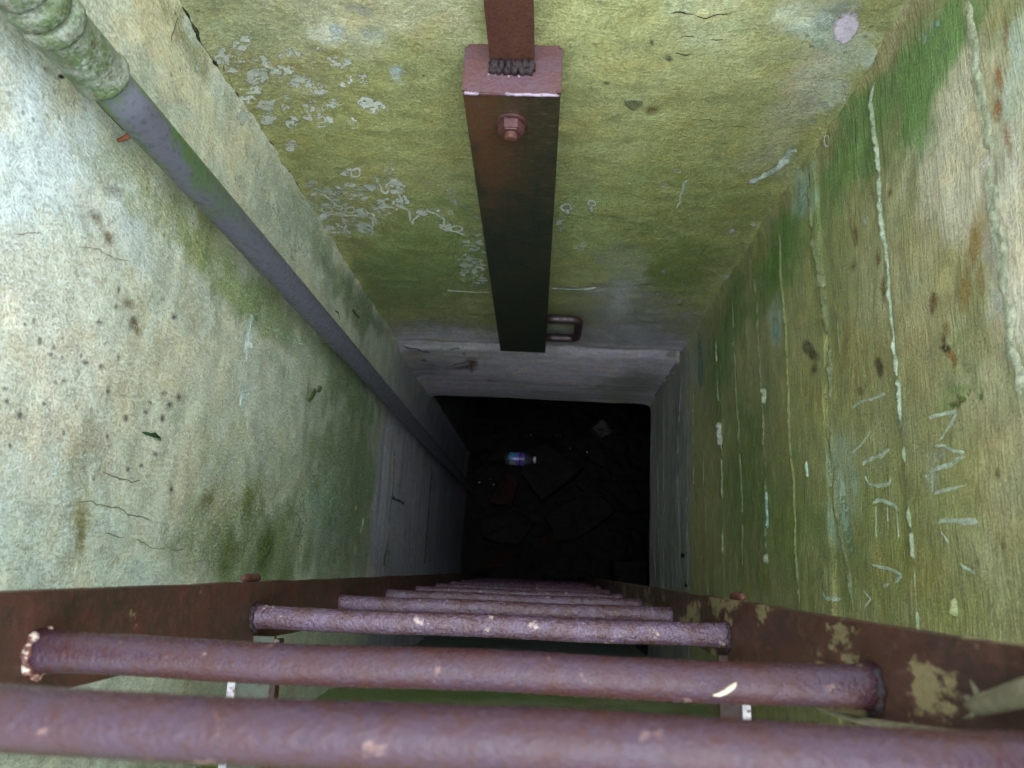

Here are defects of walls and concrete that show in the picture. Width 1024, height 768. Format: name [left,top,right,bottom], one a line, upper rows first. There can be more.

crack [670,11,727,57]
peeling [214,35,368,152]
peeling [357,97,386,114]
peeling [304,163,487,287]
damp [868,82,902,426]
damp [962,0,1024,399]
crack [104,472,140,483]
crack [78,500,184,551]
damp [906,492,914,559]